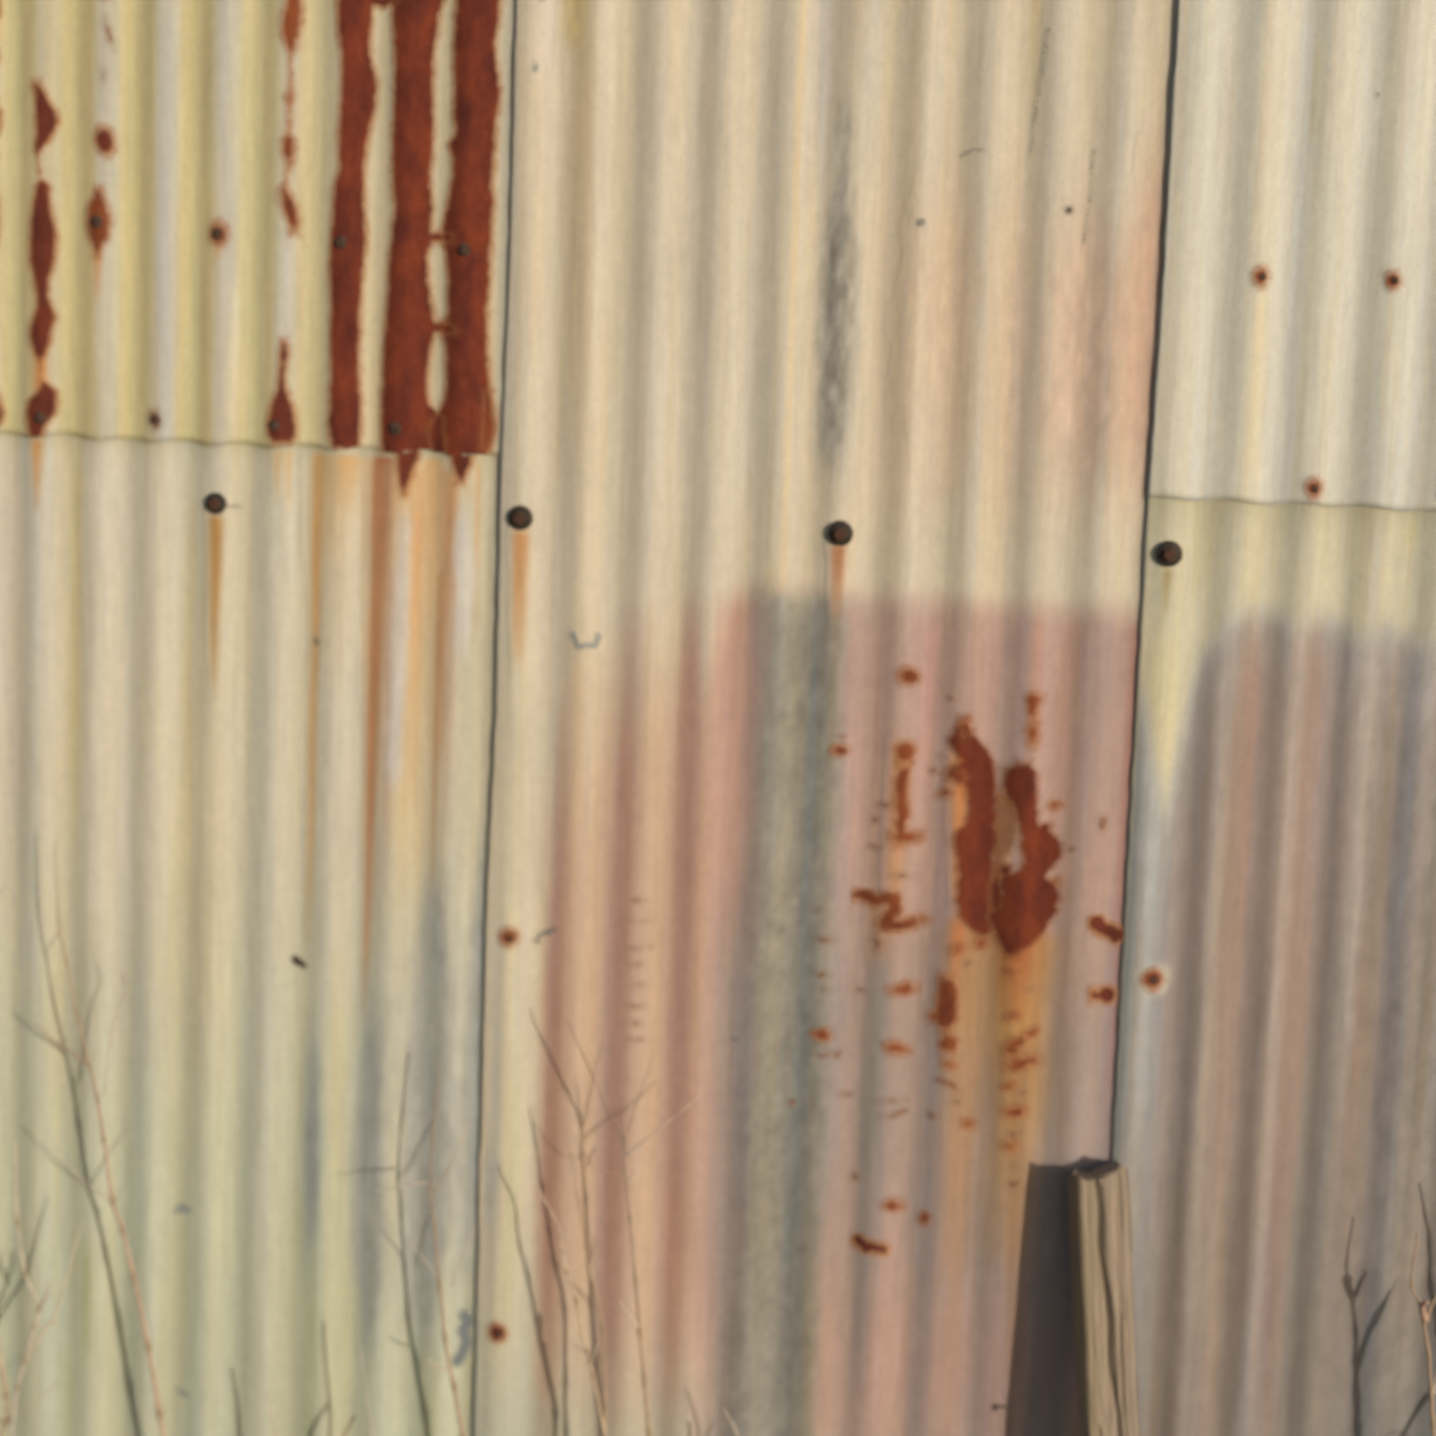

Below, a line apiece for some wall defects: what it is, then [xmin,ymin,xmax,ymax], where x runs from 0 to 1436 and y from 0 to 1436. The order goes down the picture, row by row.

corrosion [94,126,116,156]
corrosion [85,186,112,307]
corrosion [26,81,60,517]
corrosion [267,0,502,1020]
corrosion [898,666,920,685]
corrosion [1026,693,1043,745]
corrosion [830,735,849,757]
corrosion [1141,968,1164,992]
corrosion [851,716,1124,1436]